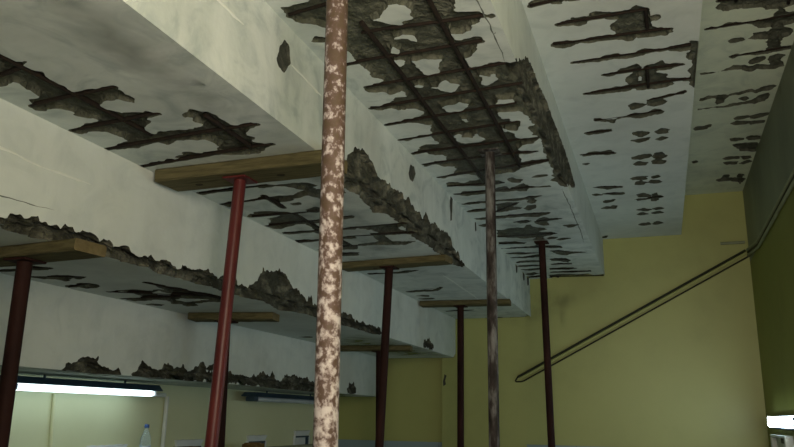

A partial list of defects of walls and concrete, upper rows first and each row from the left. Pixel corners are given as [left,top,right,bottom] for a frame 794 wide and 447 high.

spalling [281,0,326,43]
spalling [551,5,673,49]
spalling [277,40,291,73]
spalling [570,0,794,135]
spalling [0,54,276,168]
spalling [342,0,605,286]
spalling [244,182,320,250]
spalling [0,213,223,306]
spalling [234,267,317,318]
spalling [341,312,381,334]
spalling [47,356,213,382]
spalling [228,371,314,392]